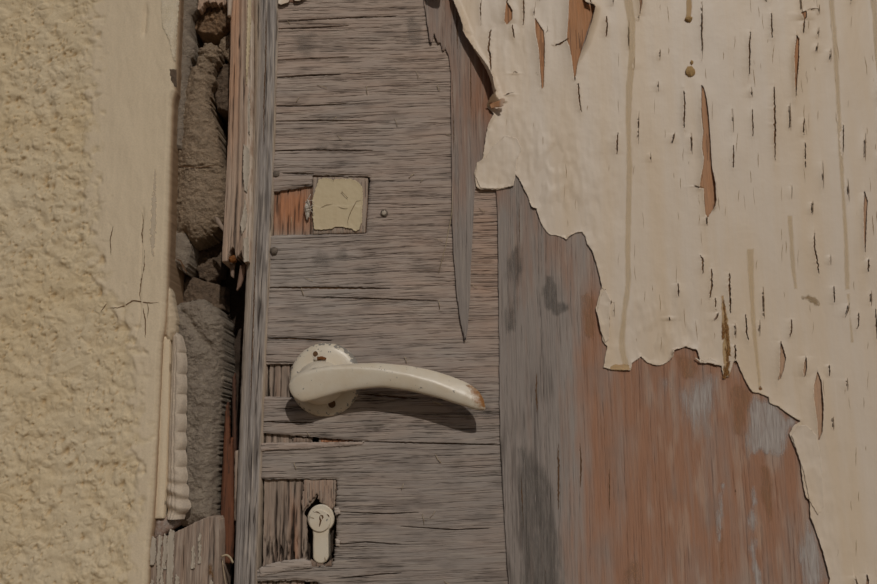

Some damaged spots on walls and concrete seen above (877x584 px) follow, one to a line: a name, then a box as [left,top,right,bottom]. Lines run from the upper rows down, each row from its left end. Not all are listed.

peeling [504,3,512,24]
peeling [535,18,545,88]
peeling [567,0,594,78]
peeling [475,135,522,189]
peeling [699,86,716,217]
crack [101,215,157,335]
spalling [219,144,250,450]
peeling [597,289,611,342]
peeling [778,344,786,379]
peeling [791,359,824,515]
peeling [150,526,187,584]